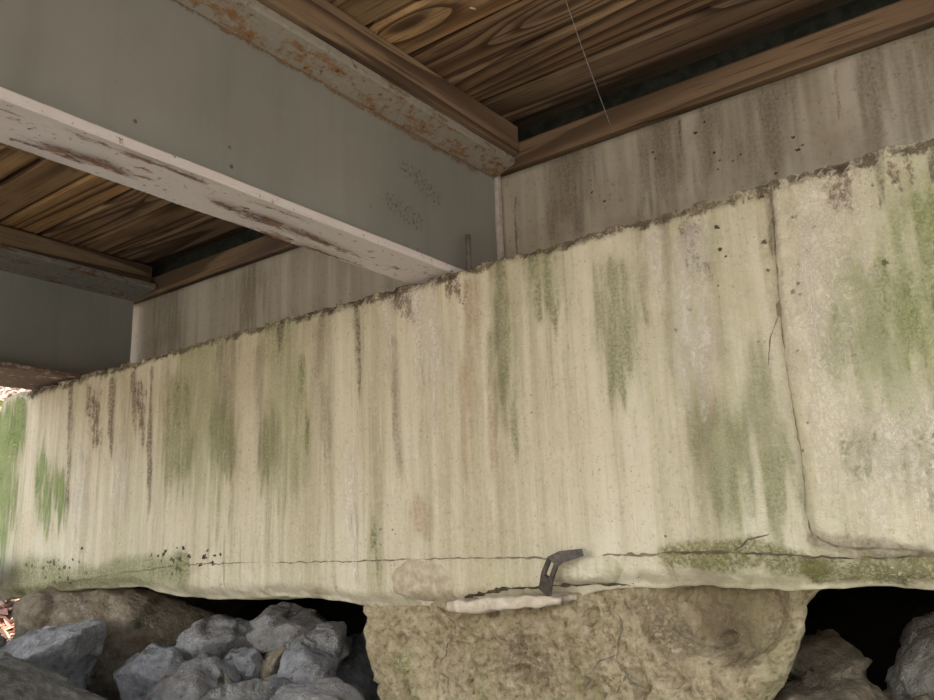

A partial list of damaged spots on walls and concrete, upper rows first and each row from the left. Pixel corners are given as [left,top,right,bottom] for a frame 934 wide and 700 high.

corrosion [214,22,477,171]
water stain [0,398,26,565]
water stain [35,389,86,537]
water stain [108,378,127,520]
crack [602,191,934,560]
water stain [783,161,934,514]